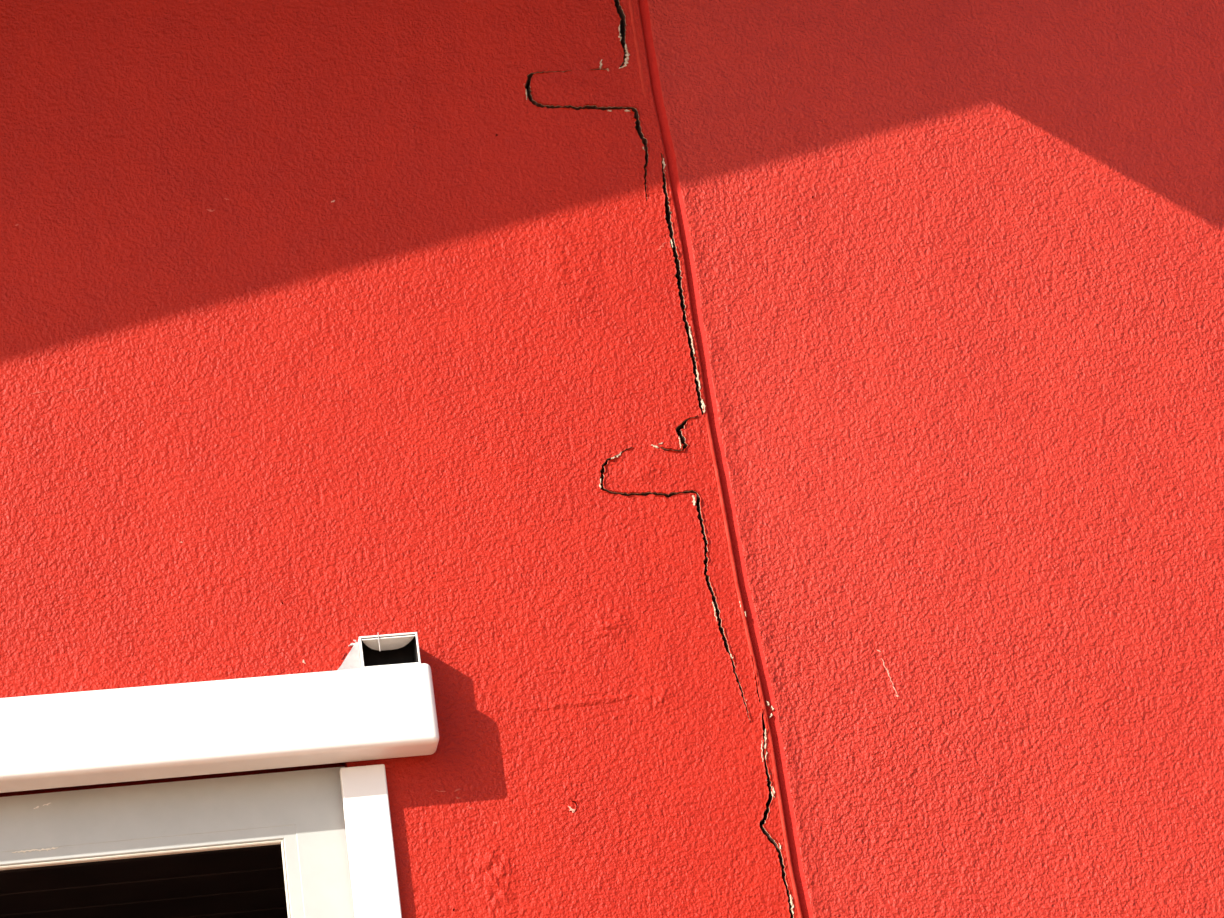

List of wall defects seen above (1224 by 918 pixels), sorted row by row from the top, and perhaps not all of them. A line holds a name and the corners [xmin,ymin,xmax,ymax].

crack [523,0,795,918]